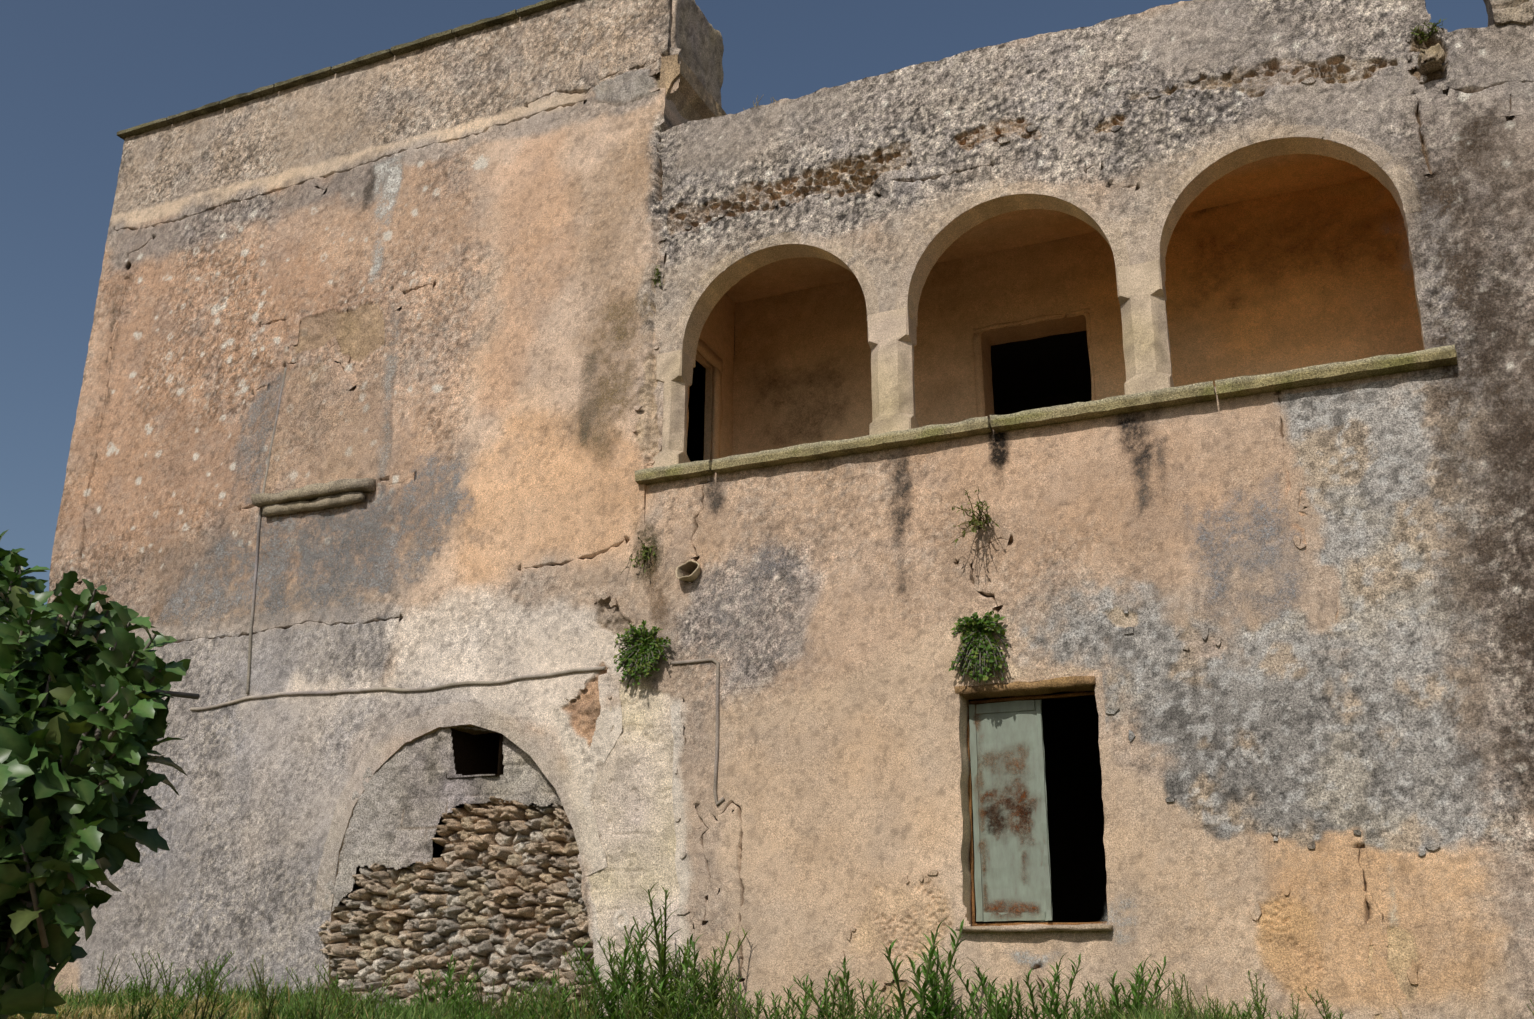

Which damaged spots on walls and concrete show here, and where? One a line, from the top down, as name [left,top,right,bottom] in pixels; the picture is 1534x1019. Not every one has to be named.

crack [1403,71,1534,176]
leakage [888,459,911,536]
leakage [1118,413,1163,506]
leakage [1412,114,1534,777]
crack [952,526,1012,610]
flaking render [998,328,1534,1019]
flaking render [553,590,696,977]
corrosion [977,748,1036,870]
flaking render [831,861,970,1019]
corrosion [984,888,1038,917]
crack [1347,848,1411,1019]